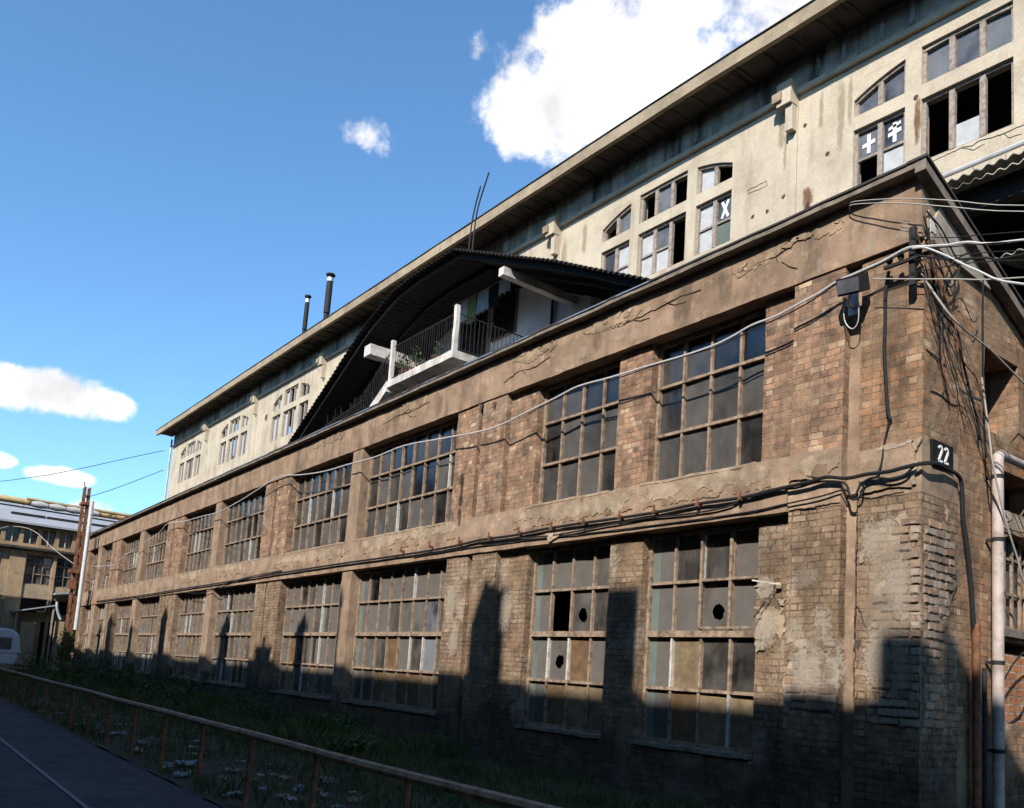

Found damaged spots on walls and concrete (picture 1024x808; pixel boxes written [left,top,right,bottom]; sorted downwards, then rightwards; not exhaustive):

corrosion [803,188,811,209]
crack [616,289,701,327]
spalling [754,584,840,713]
spalling [869,505,956,729]